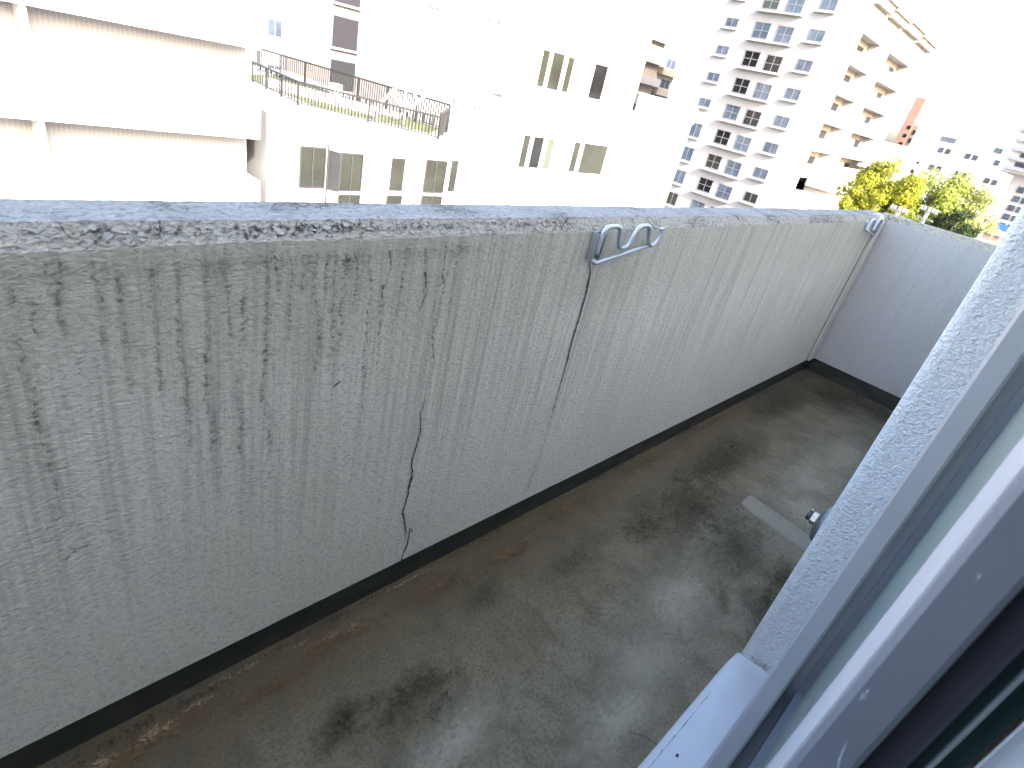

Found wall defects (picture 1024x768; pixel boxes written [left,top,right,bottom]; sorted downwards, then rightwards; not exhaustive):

crack [553,267,591,411]
crack [401,394,427,561]
leakage [775,441,868,528]
leakage [413,691,496,768]
leakage [565,564,712,767]